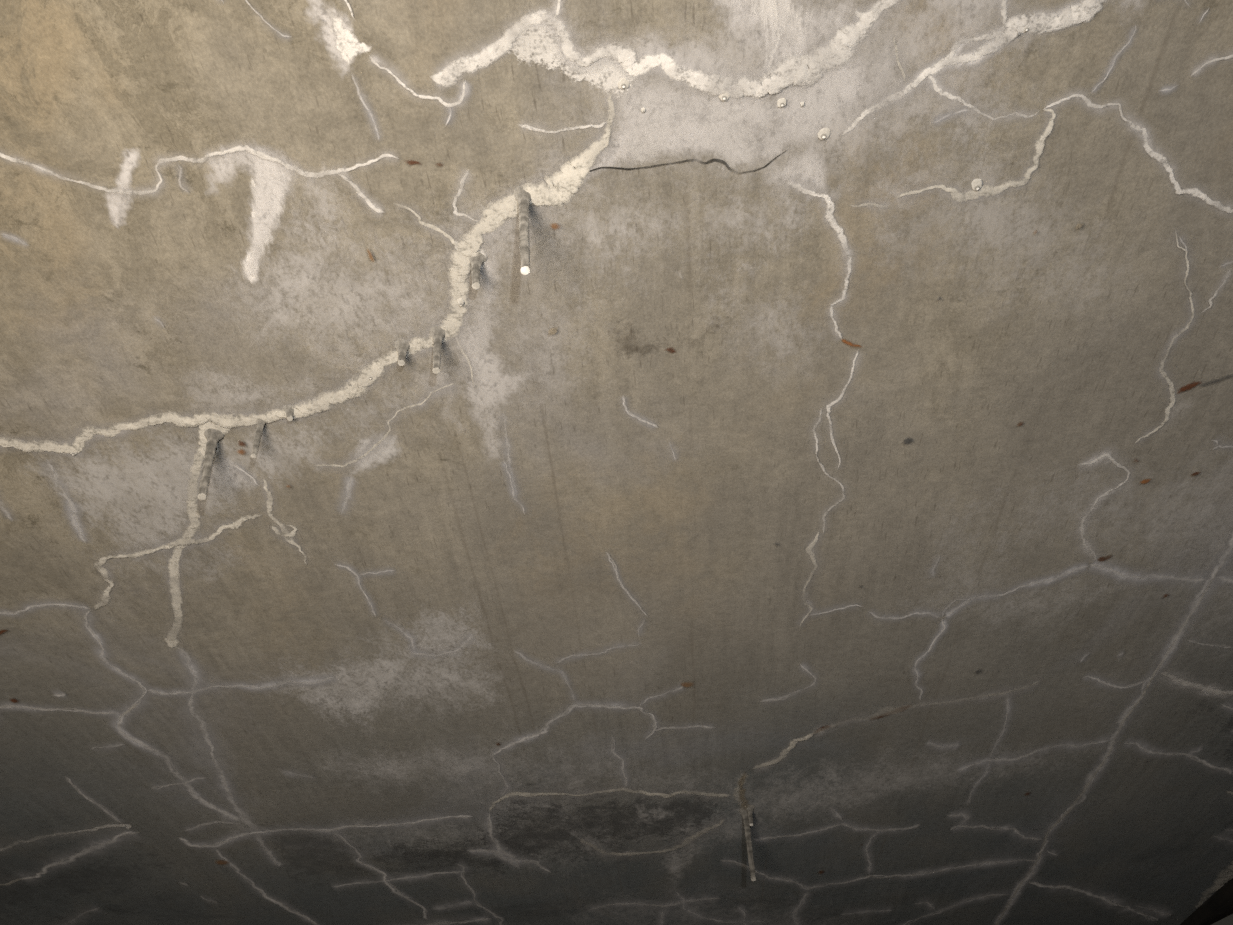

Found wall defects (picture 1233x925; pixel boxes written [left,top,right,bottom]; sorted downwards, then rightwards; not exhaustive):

crack [0,146,440,213]
crack [372,56,466,124]
crack [899,41,1233,213]
water stain [0,0,1105,688]
crack [589,151,860,495]
crack [338,565,394,615]
crack [800,234,1233,925]
crack [0,603,195,757]
crack [230,676,332,691]
crack [7,791,131,884]
crack [181,778,315,923]
crack [316,654,831,925]